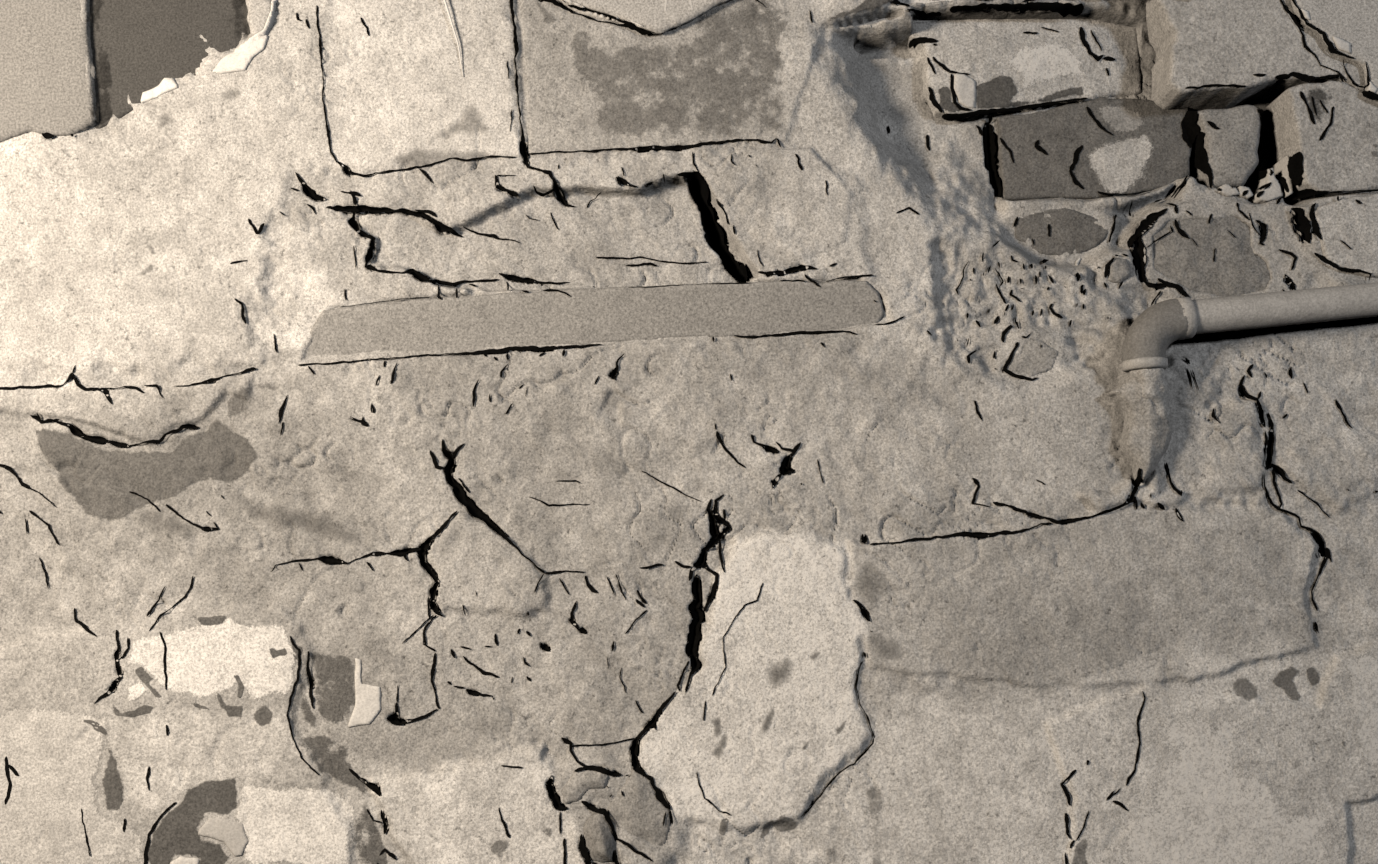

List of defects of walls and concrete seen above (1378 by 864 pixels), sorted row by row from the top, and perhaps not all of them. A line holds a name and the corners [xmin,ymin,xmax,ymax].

crack [230,0,932,347]
water stain [569,0,787,138]
peeling [938,74,1083,112]
crack [892,0,1378,306]
spalling [1219,155,1294,204]
hole [955,240,1121,361]
crack [0,298,624,448]
crack [861,462,1184,545]
crack [0,464,193,703]
crack [272,439,763,864]
peeling [84,720,123,810]
peeling [147,778,248,864]